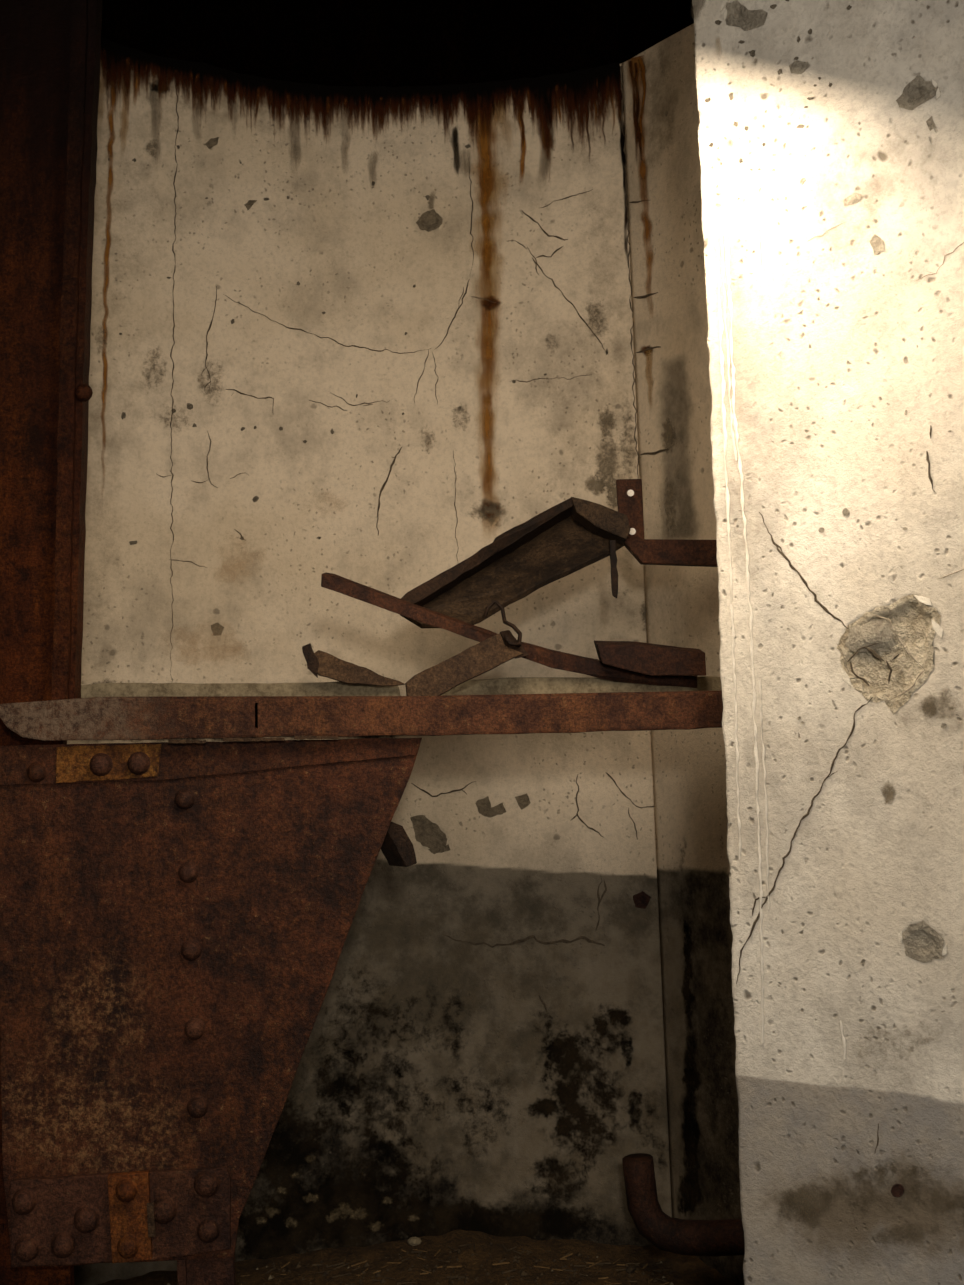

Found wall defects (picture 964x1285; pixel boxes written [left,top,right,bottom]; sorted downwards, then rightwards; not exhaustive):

crack [157,85,496,681]
corrosion [100,36,653,522]
crack [509,82,669,478]
crack [736,512,925,984]
spalling [837,594,943,714]
water stain [237,971,664,1260]
water stain [678,921,703,1213]